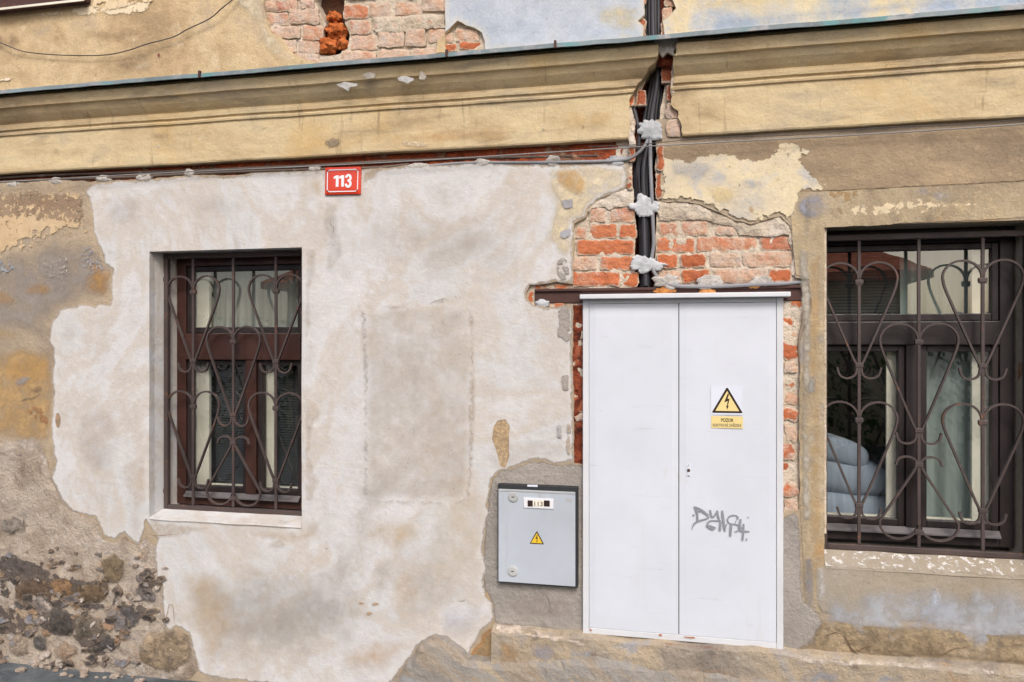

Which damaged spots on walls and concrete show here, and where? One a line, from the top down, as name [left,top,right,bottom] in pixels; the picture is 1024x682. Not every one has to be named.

spalling [238,0,485,63]
peeling [0,188,87,262]
spalling [527,0,827,512]
spalling [492,420,510,468]
spalling [0,438,198,681]
peeling [824,550,1024,577]